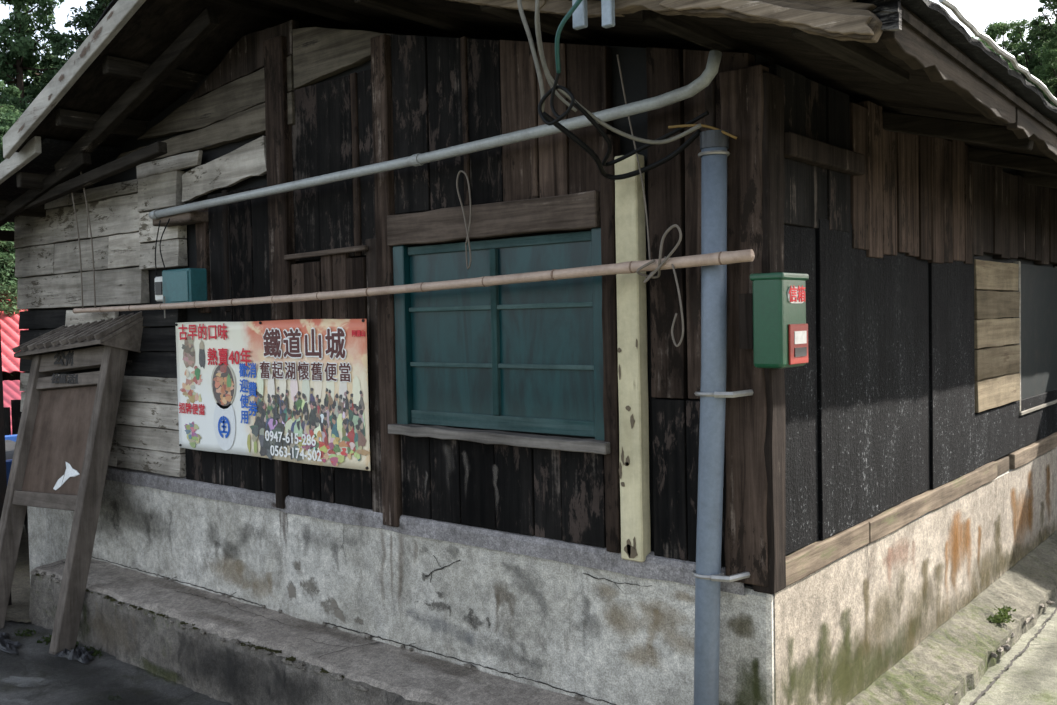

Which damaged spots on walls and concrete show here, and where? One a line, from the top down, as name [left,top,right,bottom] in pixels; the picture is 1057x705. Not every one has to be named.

peeling [619,447,630,487]
corrosion [1012,473,1033,528]
peeling [624,537,638,558]
corrosion [946,515,981,583]
crack [91,555,616,705]
damp [426,592,451,616]
damp [464,587,512,629]
damp [731,618,751,634]
damp [819,624,828,685]